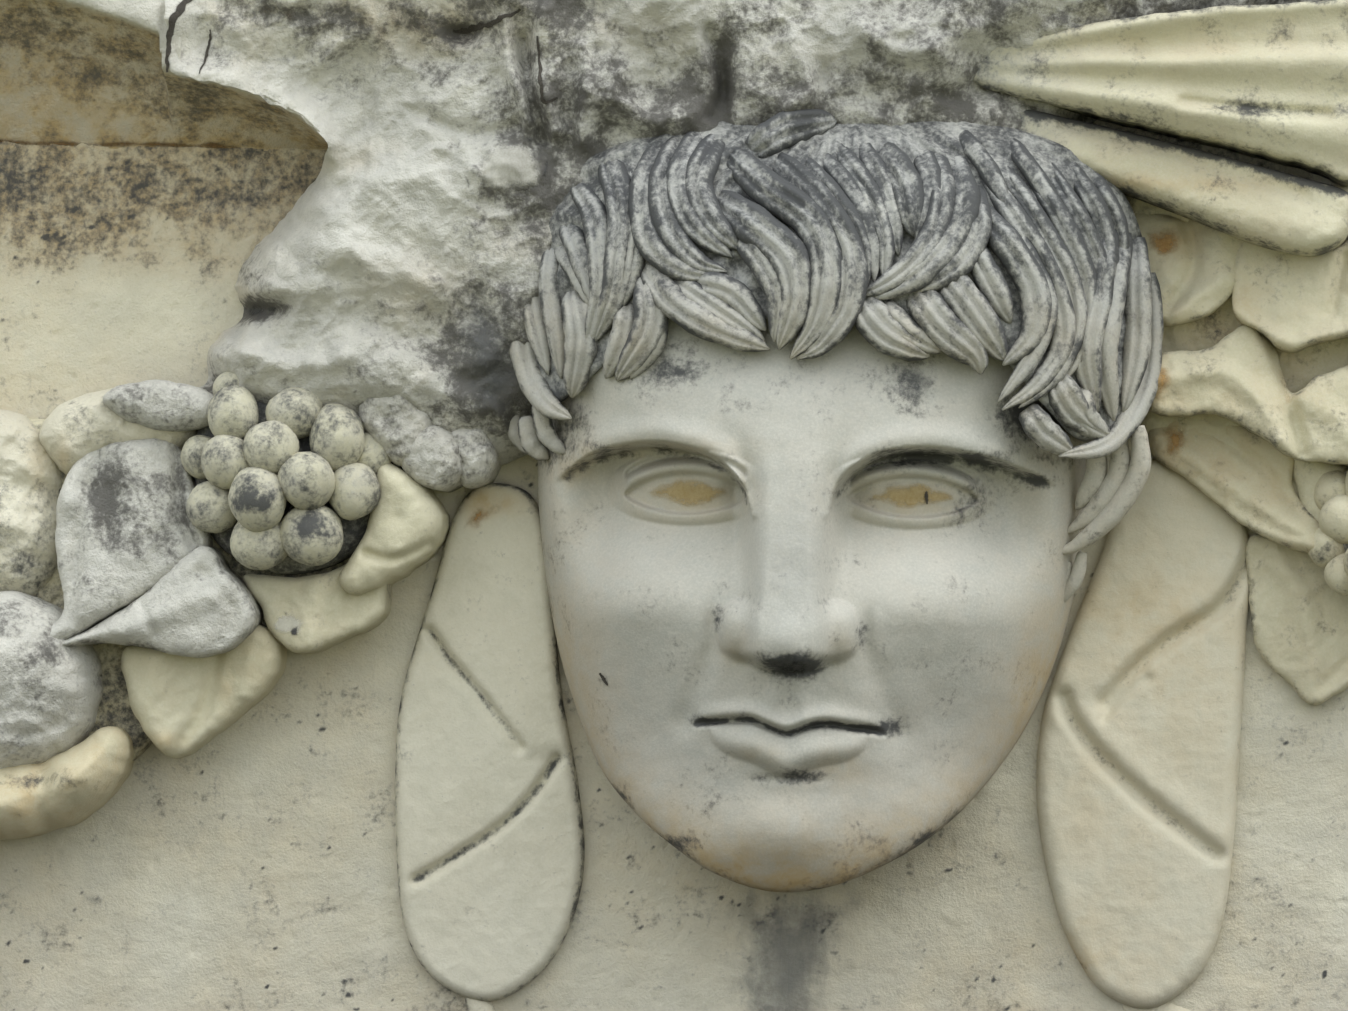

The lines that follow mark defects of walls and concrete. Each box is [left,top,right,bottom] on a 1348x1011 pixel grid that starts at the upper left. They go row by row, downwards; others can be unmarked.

crack [165,0,212,74]